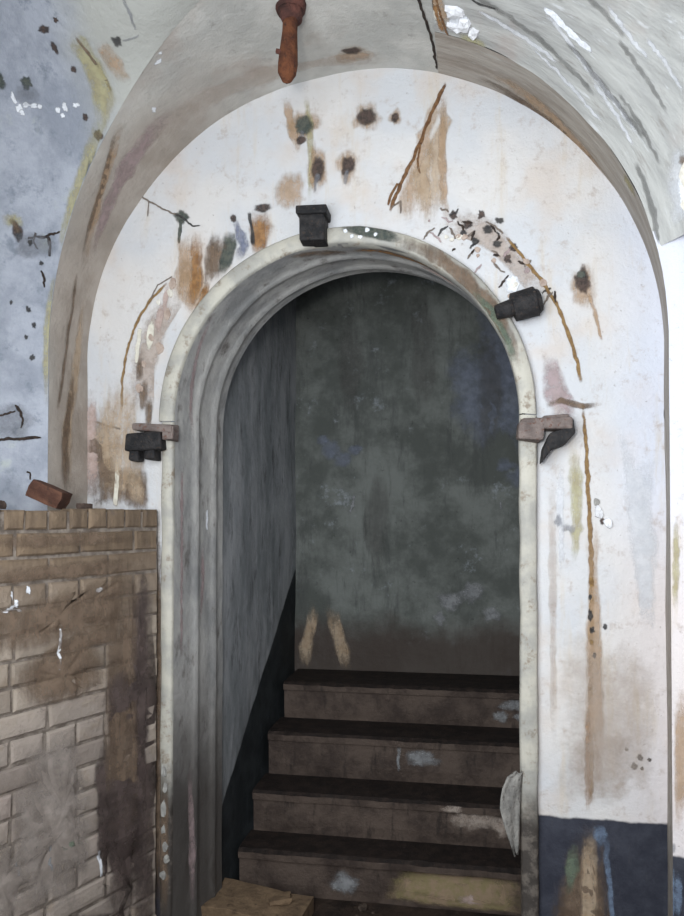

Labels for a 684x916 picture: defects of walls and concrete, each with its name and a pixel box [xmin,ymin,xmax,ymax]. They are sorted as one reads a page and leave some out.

crack [142,196,176,216]
corrosion [174,204,270,305]
crack [387,0,449,213]
corrosion [403,112,451,202]
flaking render [424,208,556,305]
flaking render [671,158,684,213]
corrosion [582,413,607,795]
water stain [25,563,161,916]